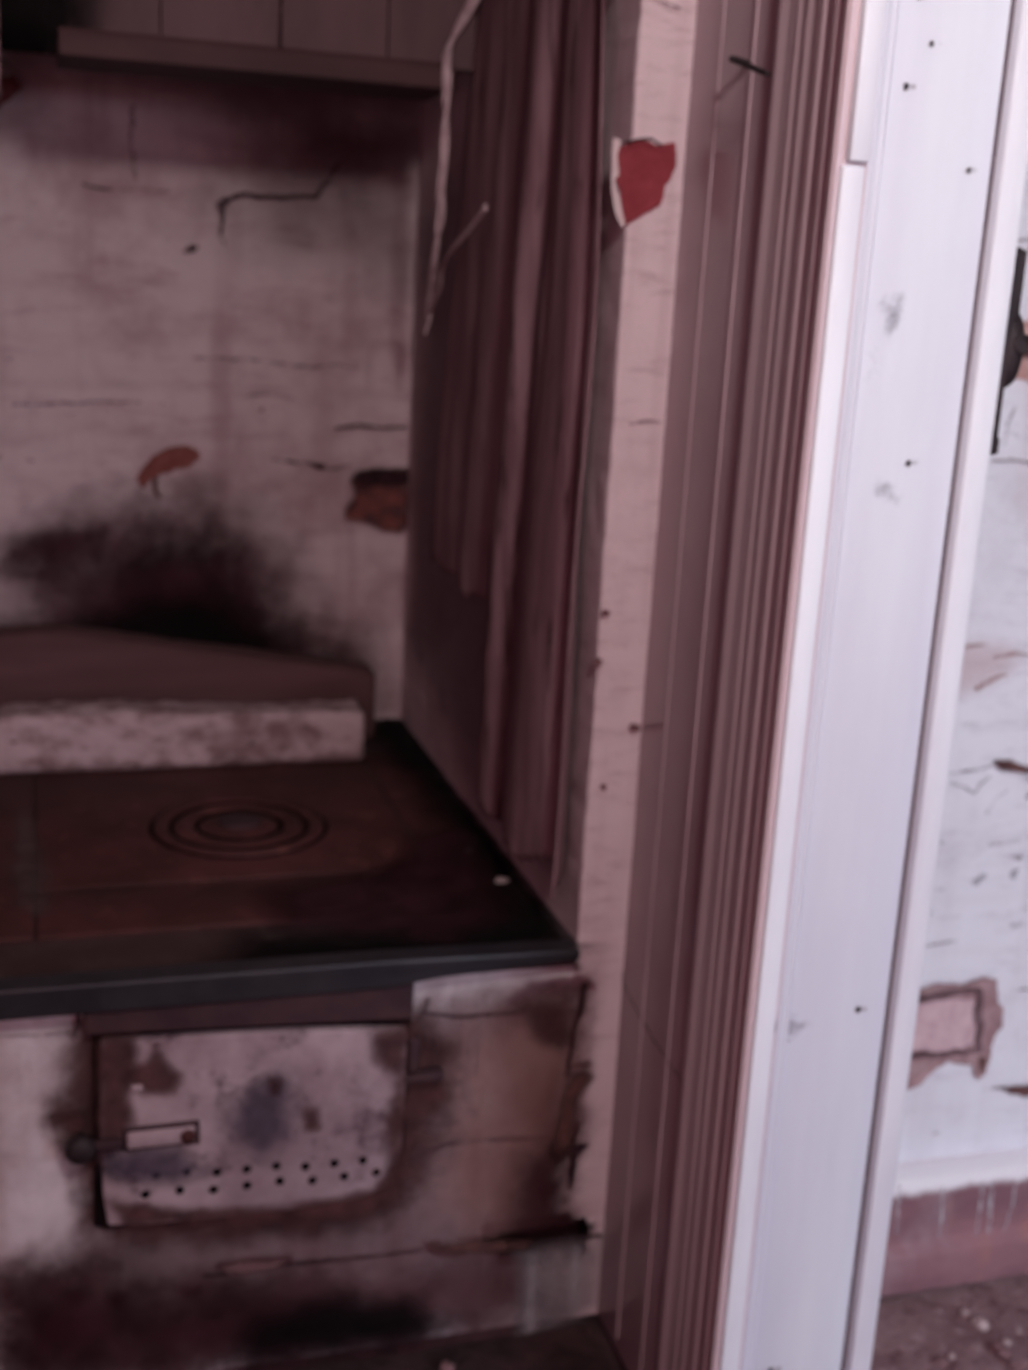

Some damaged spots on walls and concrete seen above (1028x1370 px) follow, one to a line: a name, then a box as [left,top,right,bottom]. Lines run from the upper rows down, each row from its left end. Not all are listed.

crack [216,162,340,242]
flaking render [611,137,677,227]
flaking render [1015,353,1028,381]
peeling [136,445,200,499]
flaking render [345,467,409,533]
water stain [10,531,93,563]
water stain [100,561,270,650]
crack [951,760,1028,814]
flaking render [907,977,1004,1090]
spalling [995,1086,1028,1097]
water stain [252,1301,431,1355]